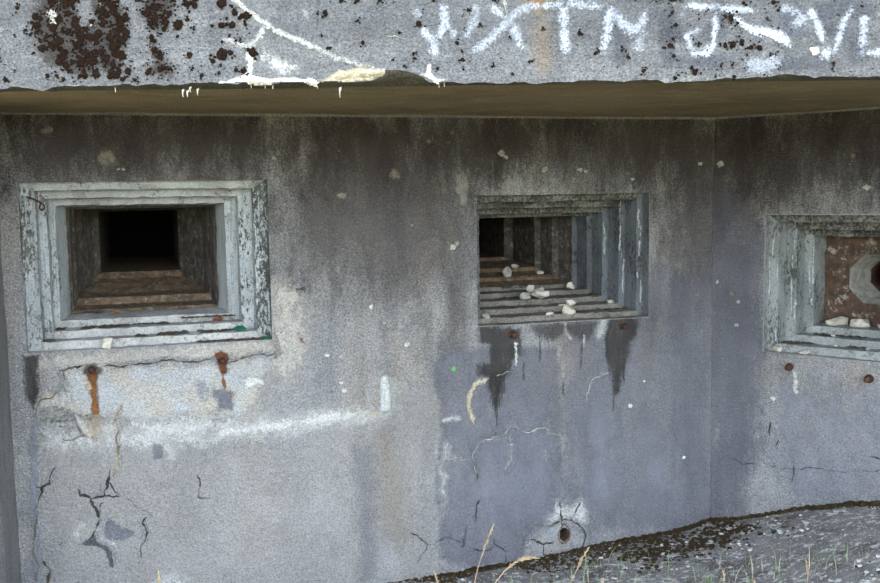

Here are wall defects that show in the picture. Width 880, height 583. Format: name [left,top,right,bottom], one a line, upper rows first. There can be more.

crack [222,0,379,75]
damp [6,115,273,181]
peeling [241,188,260,258]
peeling [44,234,60,328]
damp [282,109,880,518]
rust [84,364,101,414]
crack [35,351,277,438]
rust [215,351,229,388]
crack [78,405,153,567]
crack [410,371,565,563]
crack [731,422,880,480]
crack [530,500,588,556]